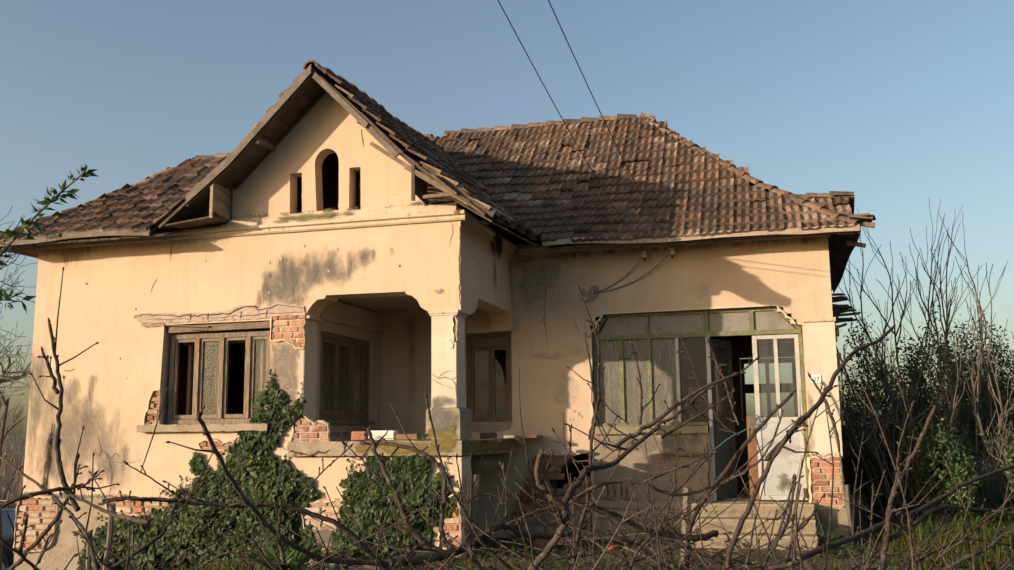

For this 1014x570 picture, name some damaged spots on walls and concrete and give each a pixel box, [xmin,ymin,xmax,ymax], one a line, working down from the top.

damp [254,244,369,304]
flaking render [269,313,307,350]
damp [25,365,125,478]
flaking render [143,388,163,425]
flaking render [290,413,370,442]
flaking render [807,321,845,510]
flaking render [13,495,60,554]
flaking render [508,451,682,540]